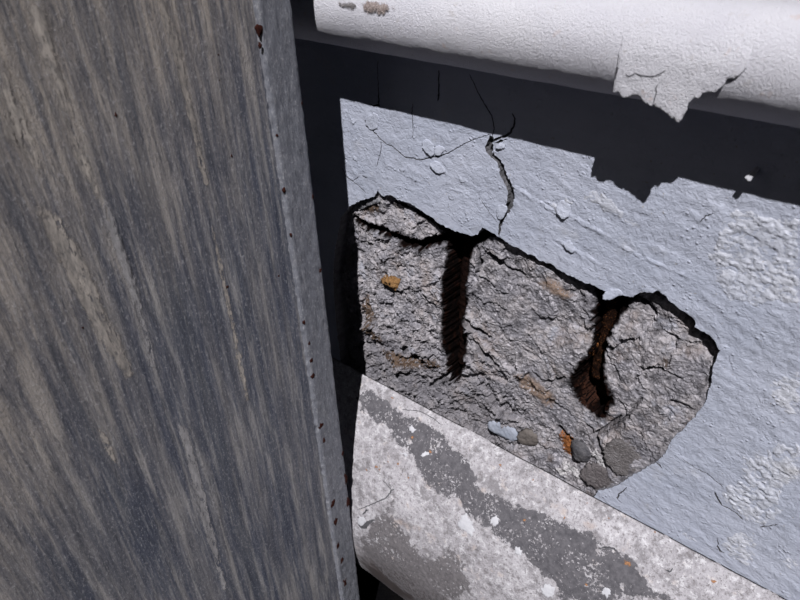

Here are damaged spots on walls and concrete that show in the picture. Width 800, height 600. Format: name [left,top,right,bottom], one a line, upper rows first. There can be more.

peeling [613,23,752,123]
crack [365,64,535,235]
peeling [744,167,760,181]
spalling [333,191,720,497]
corrosion [577,338,610,409]